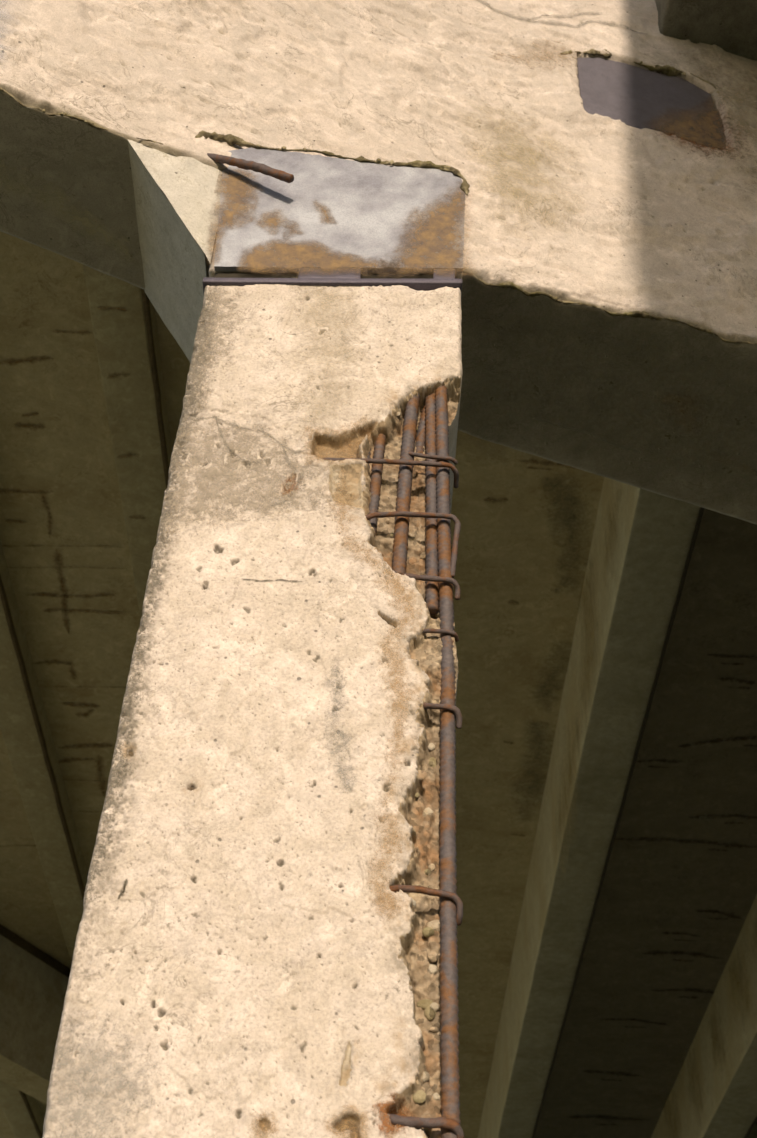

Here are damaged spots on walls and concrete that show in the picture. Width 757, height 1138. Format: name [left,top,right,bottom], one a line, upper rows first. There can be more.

crack [480,0,637,32]
spalling [560,49,612,58]
spalling [633,61,719,93]
rust [209,170,470,274]
rust [354,544,414,751]
spalling [311,375,461,1138]
rust [377,1094,409,1137]